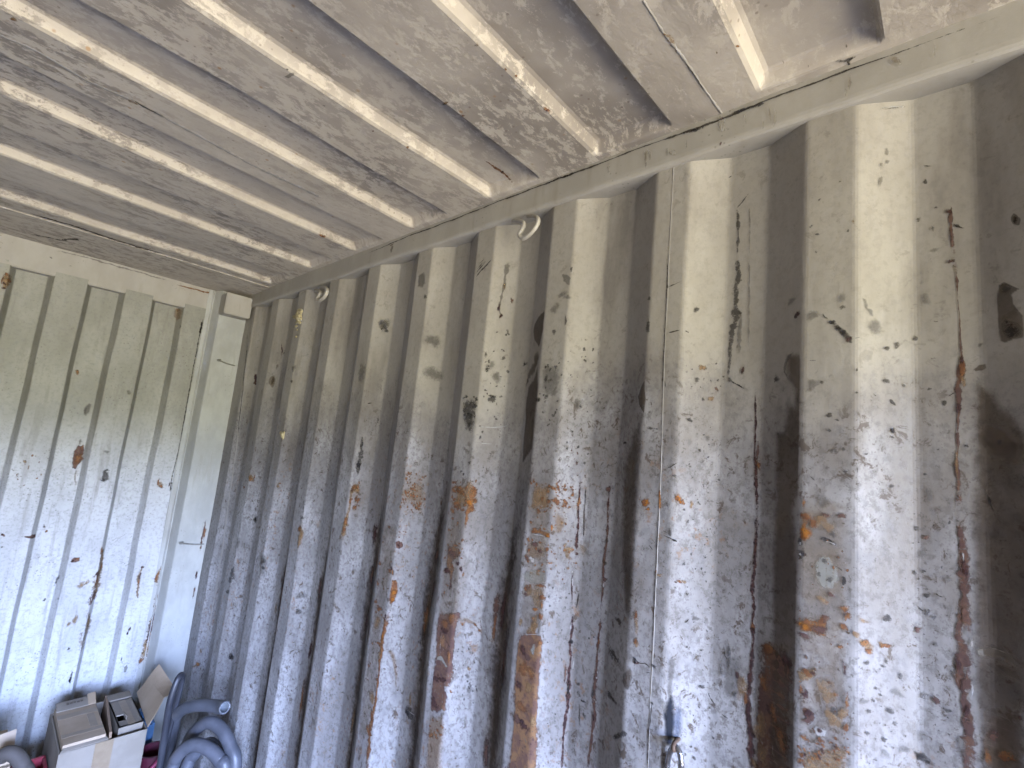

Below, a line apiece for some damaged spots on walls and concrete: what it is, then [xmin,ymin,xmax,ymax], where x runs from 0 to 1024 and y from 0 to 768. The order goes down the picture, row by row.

peeling [997,283,1023,342]
rust [72,445,84,469]
rust [339,481,360,538]
rust [400,472,427,515]
rust [799,499,846,541]
rust [397,479,577,768]
rust [798,578,891,675]
rust [754,642,851,768]